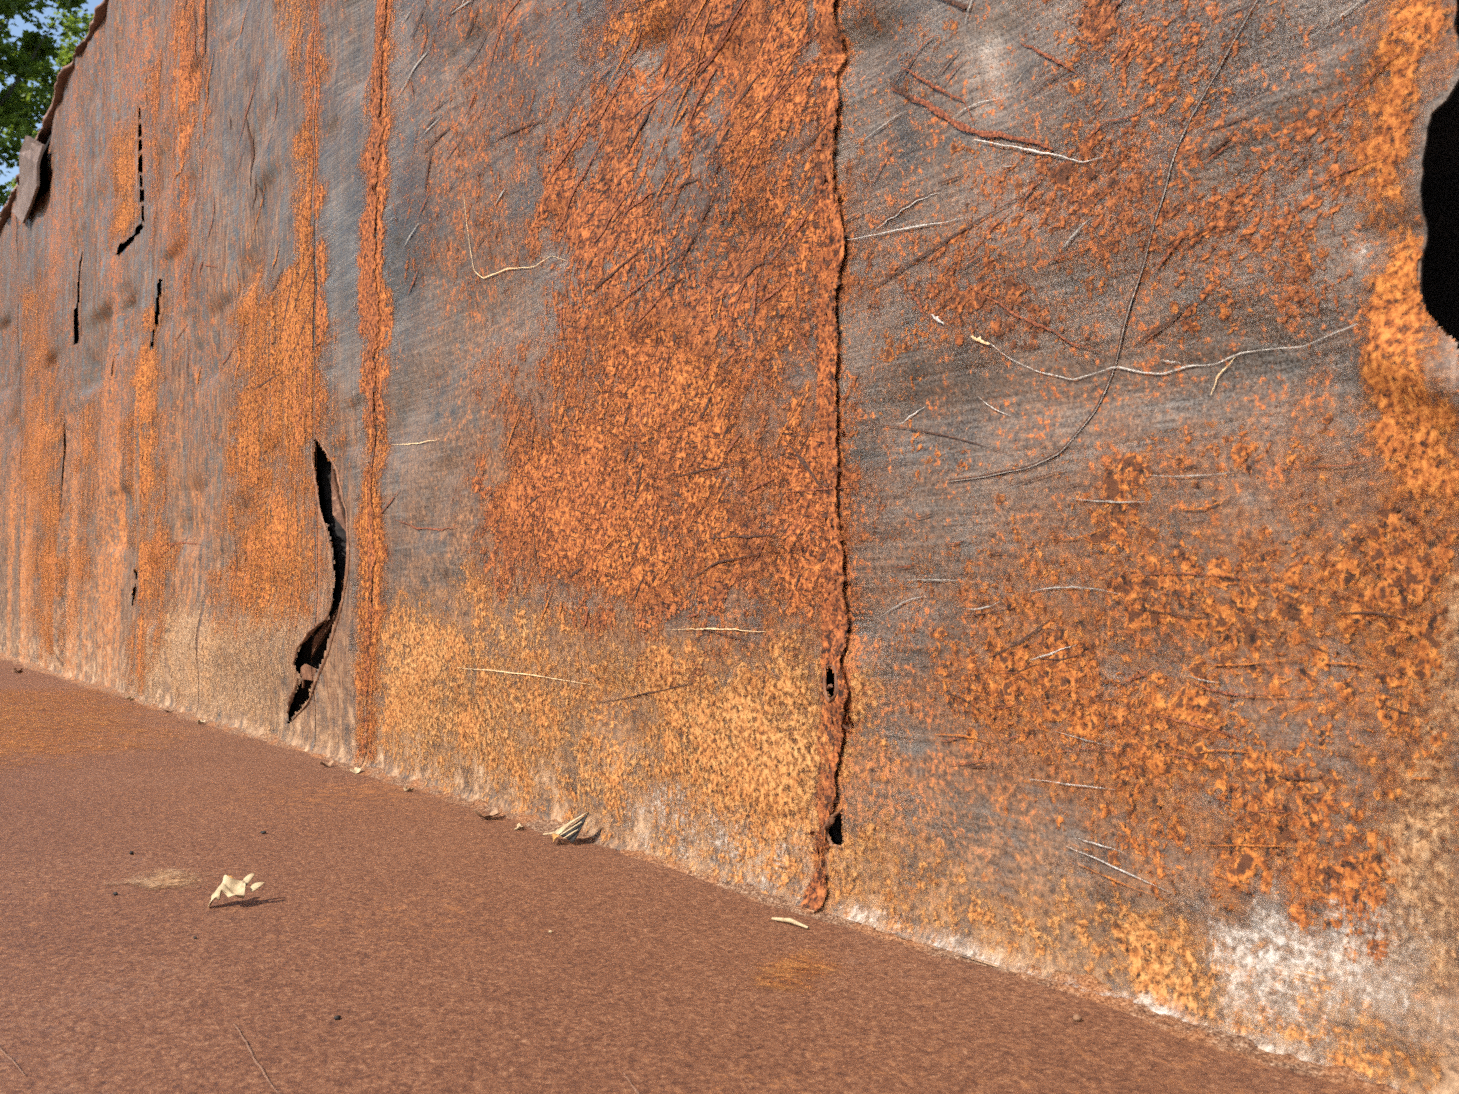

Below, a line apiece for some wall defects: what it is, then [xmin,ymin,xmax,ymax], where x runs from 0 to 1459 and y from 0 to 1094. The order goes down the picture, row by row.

crack [124,106,139,250]
corrosion [0,0,350,764]
corrosion [329,0,1459,1093]
damp [847,906,876,923]
damp [933,937,997,965]
damp [1134,994,1207,1025]
damp [1210,899,1412,1062]